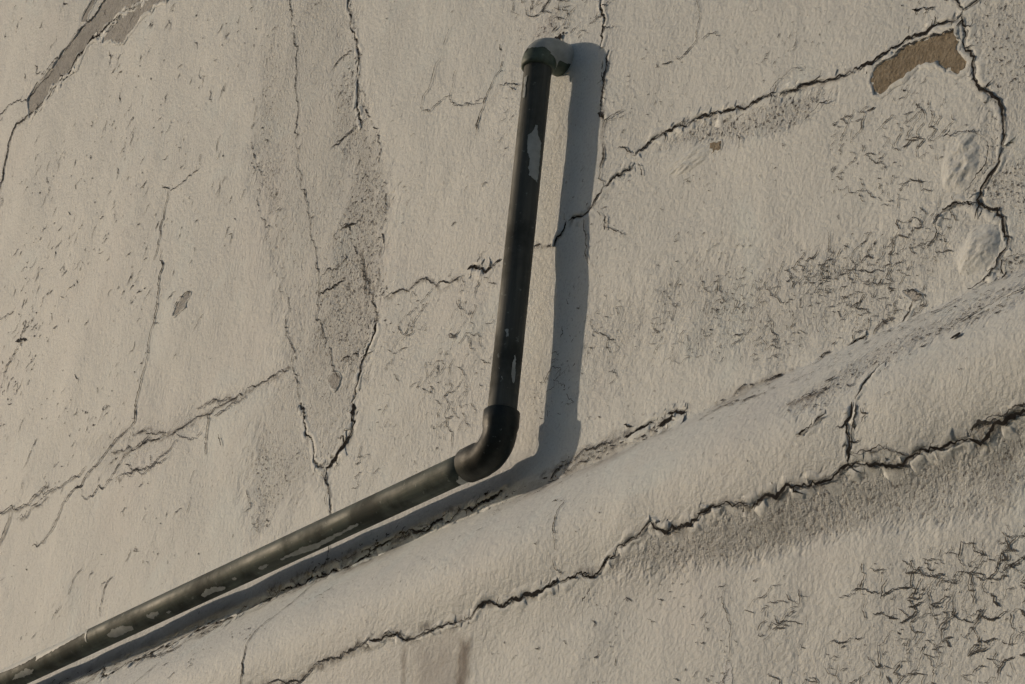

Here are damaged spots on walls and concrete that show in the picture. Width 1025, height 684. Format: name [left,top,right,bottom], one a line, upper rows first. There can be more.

peeling [24,0,175,122]
peeling [867,1,1025,124]
peeling [5,136,124,342]
crack [0,0,500,544]
crack [511,0,1025,480]
crack [73,361,1025,684]